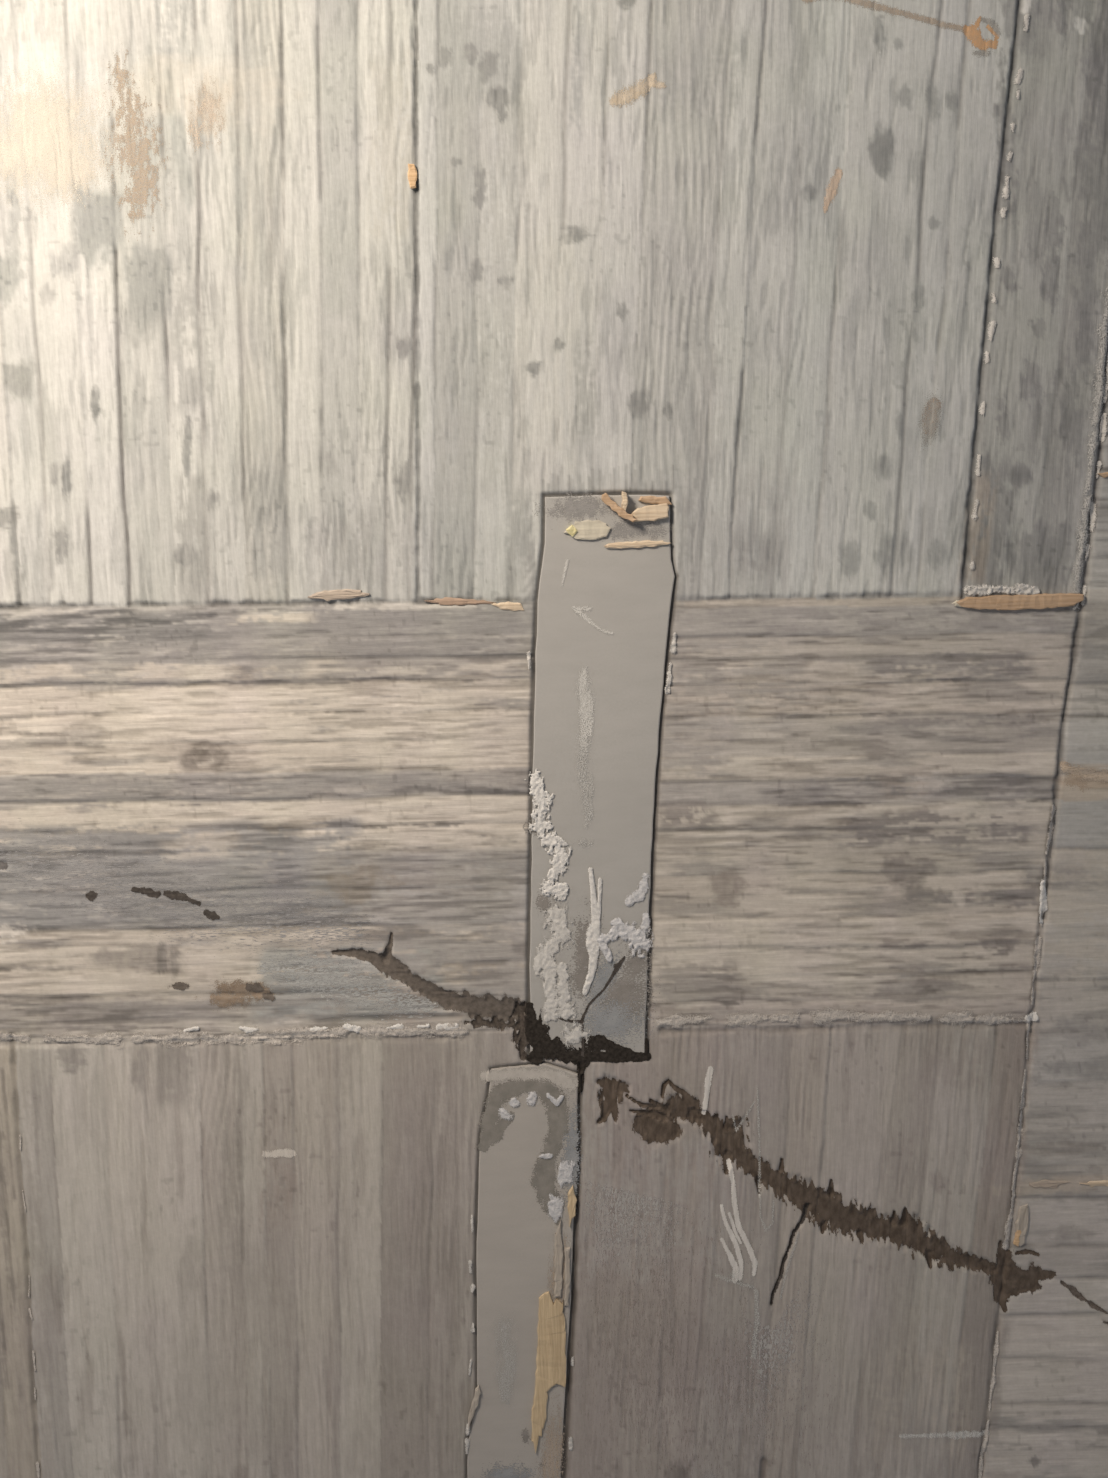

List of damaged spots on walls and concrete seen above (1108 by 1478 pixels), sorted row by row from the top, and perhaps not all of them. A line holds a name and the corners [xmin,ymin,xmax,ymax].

rust [835,0,1001,58]
crack [0,861,8,870]
crack [85,887,220,921]
leakage [523,768,661,1051]
crack [332,932,537,1061]
crack [597,1077,1108,1324]